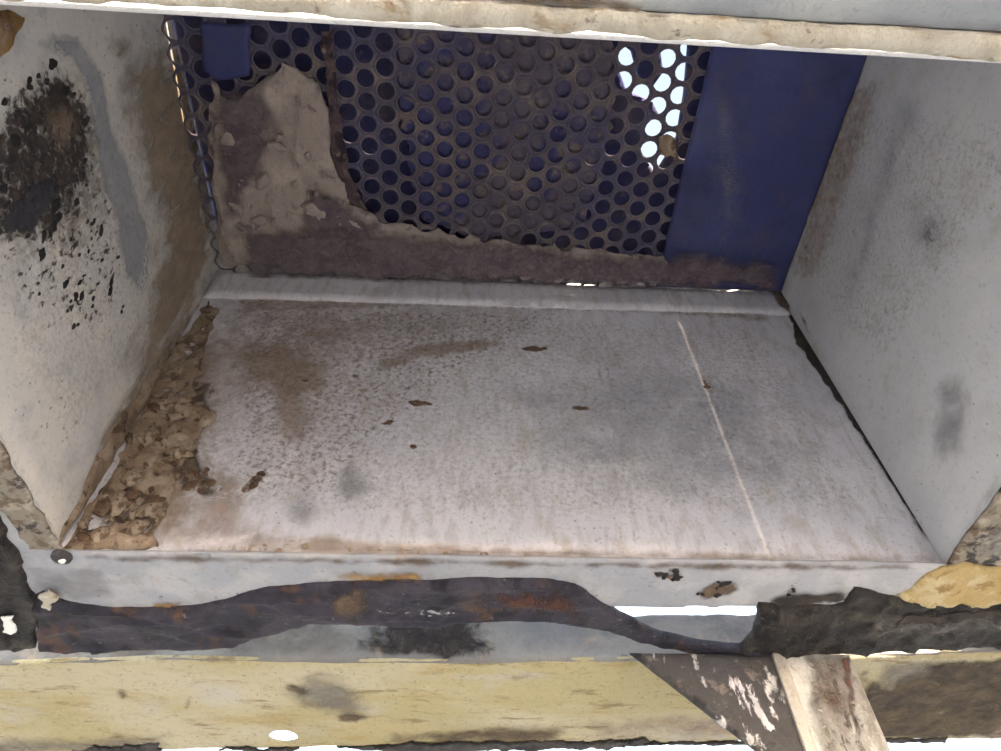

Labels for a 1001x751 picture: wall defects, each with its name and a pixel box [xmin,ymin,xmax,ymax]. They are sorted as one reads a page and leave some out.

damp [0,41,150,330]
corrosion [59,51,230,561]
corrosion [237,300,562,493]
corrosion [172,550,217,563]
corrosion [238,541,435,616]
corrosion [443,549,543,568]
corrosion [683,556,734,570]